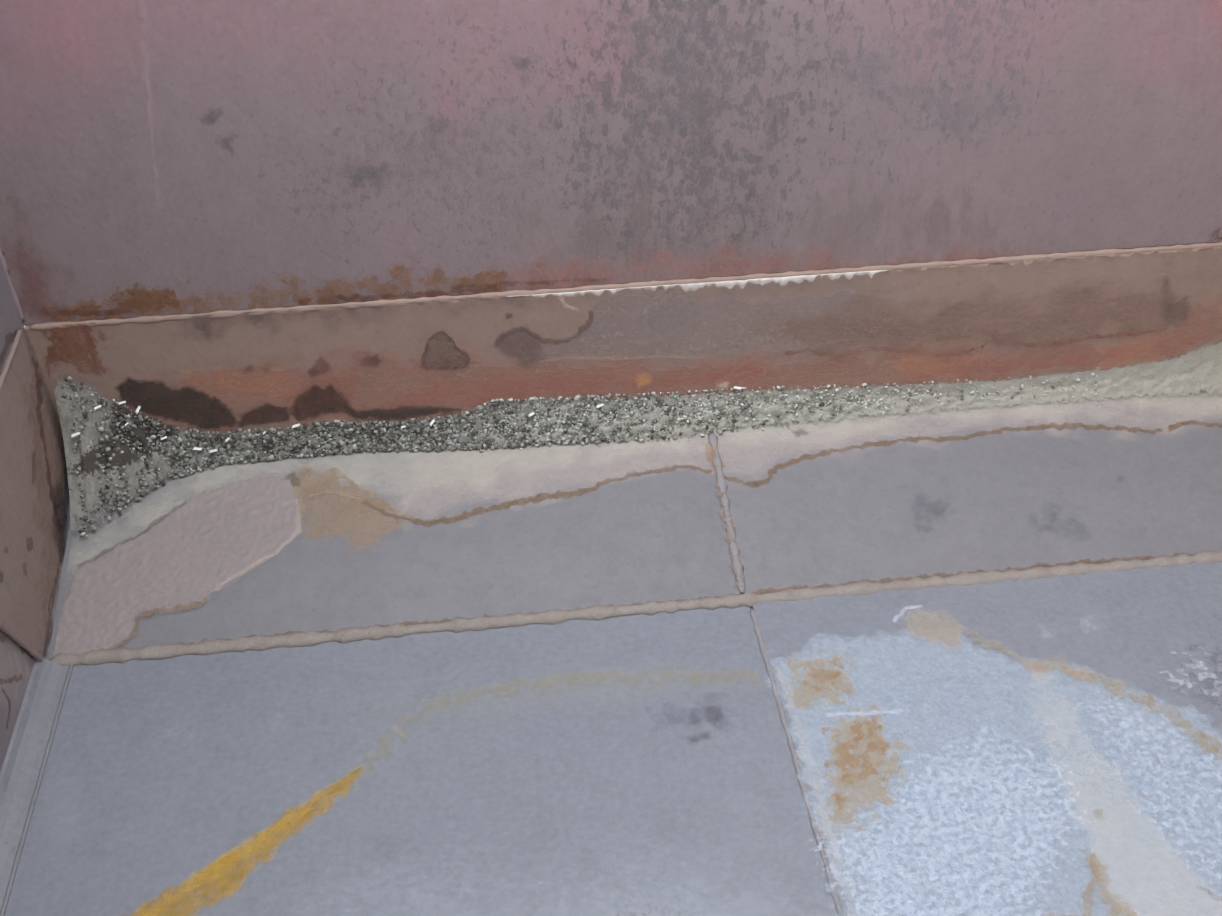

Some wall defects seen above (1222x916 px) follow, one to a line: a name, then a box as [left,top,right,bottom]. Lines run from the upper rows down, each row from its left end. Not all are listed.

rust [249,262,606,309]
rust [32,281,231,584]
water stain [54,342,1222,530]
peeling [54,476,298,656]